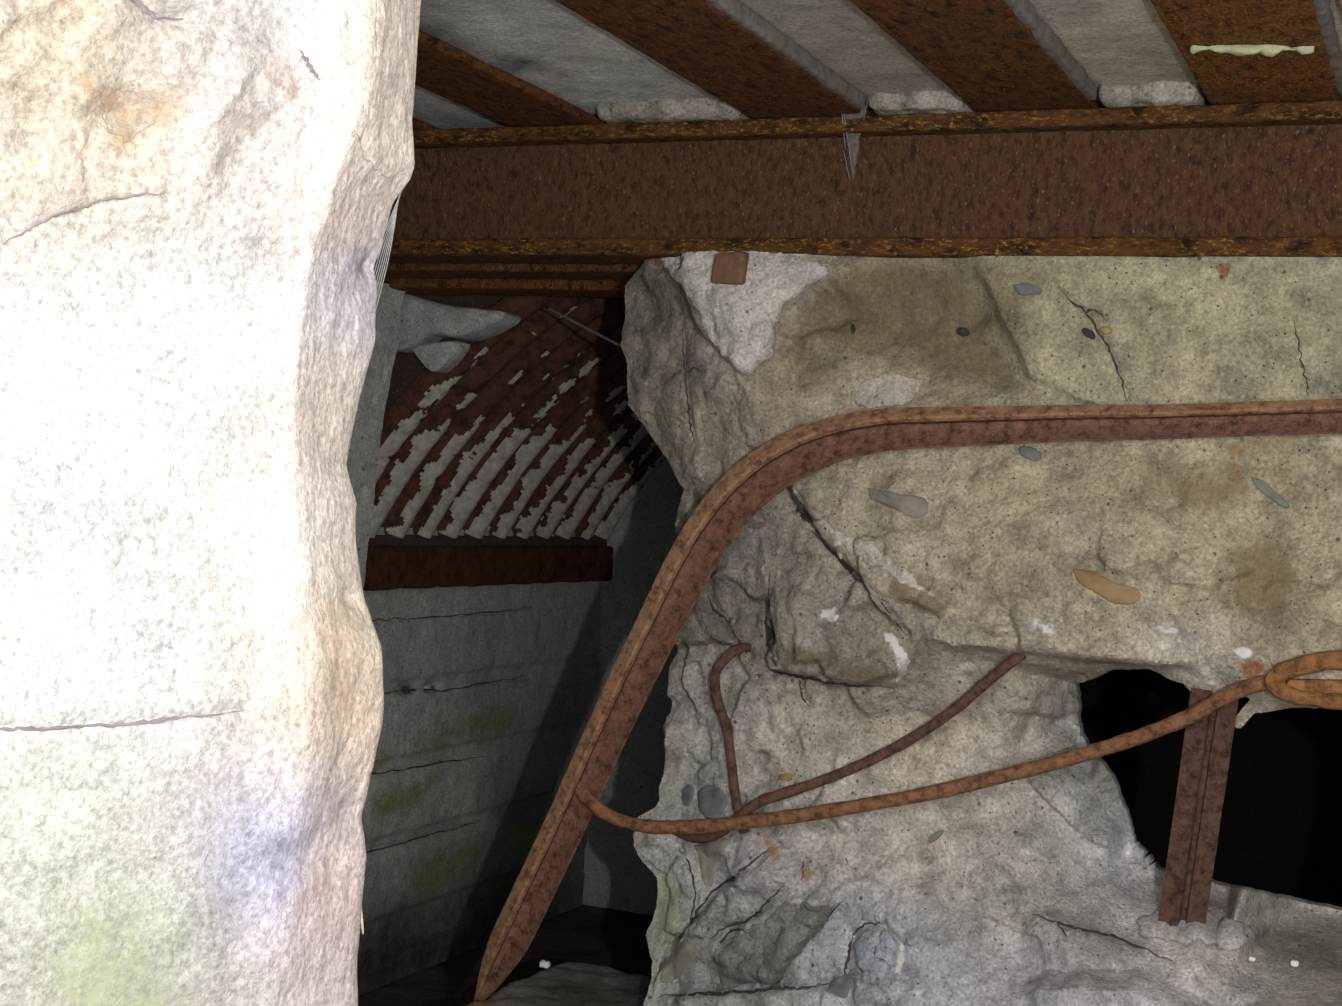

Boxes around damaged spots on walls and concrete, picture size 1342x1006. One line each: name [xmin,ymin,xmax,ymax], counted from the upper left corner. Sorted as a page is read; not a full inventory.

crack [4,192,166,244]
crack [1058,286,1129,404]
peeling [370,341,666,540]
crack [0,711,238,732]
crack [678,843,805,944]
crack [659,903,881,997]